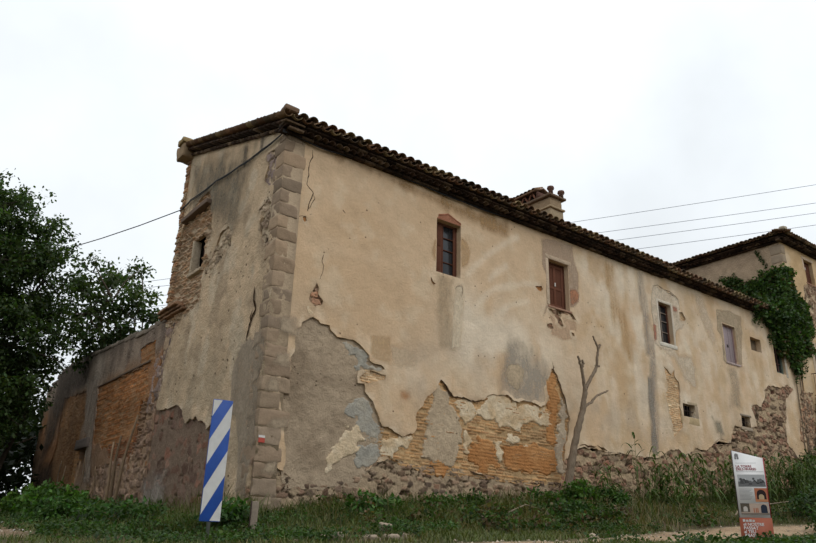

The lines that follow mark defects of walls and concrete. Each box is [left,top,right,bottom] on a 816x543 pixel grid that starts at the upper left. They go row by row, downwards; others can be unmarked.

flaking render [82,189,233,505]
crack [299,151,315,217]
flaking render [274,284,816,513]
peeling [543,239,579,339]